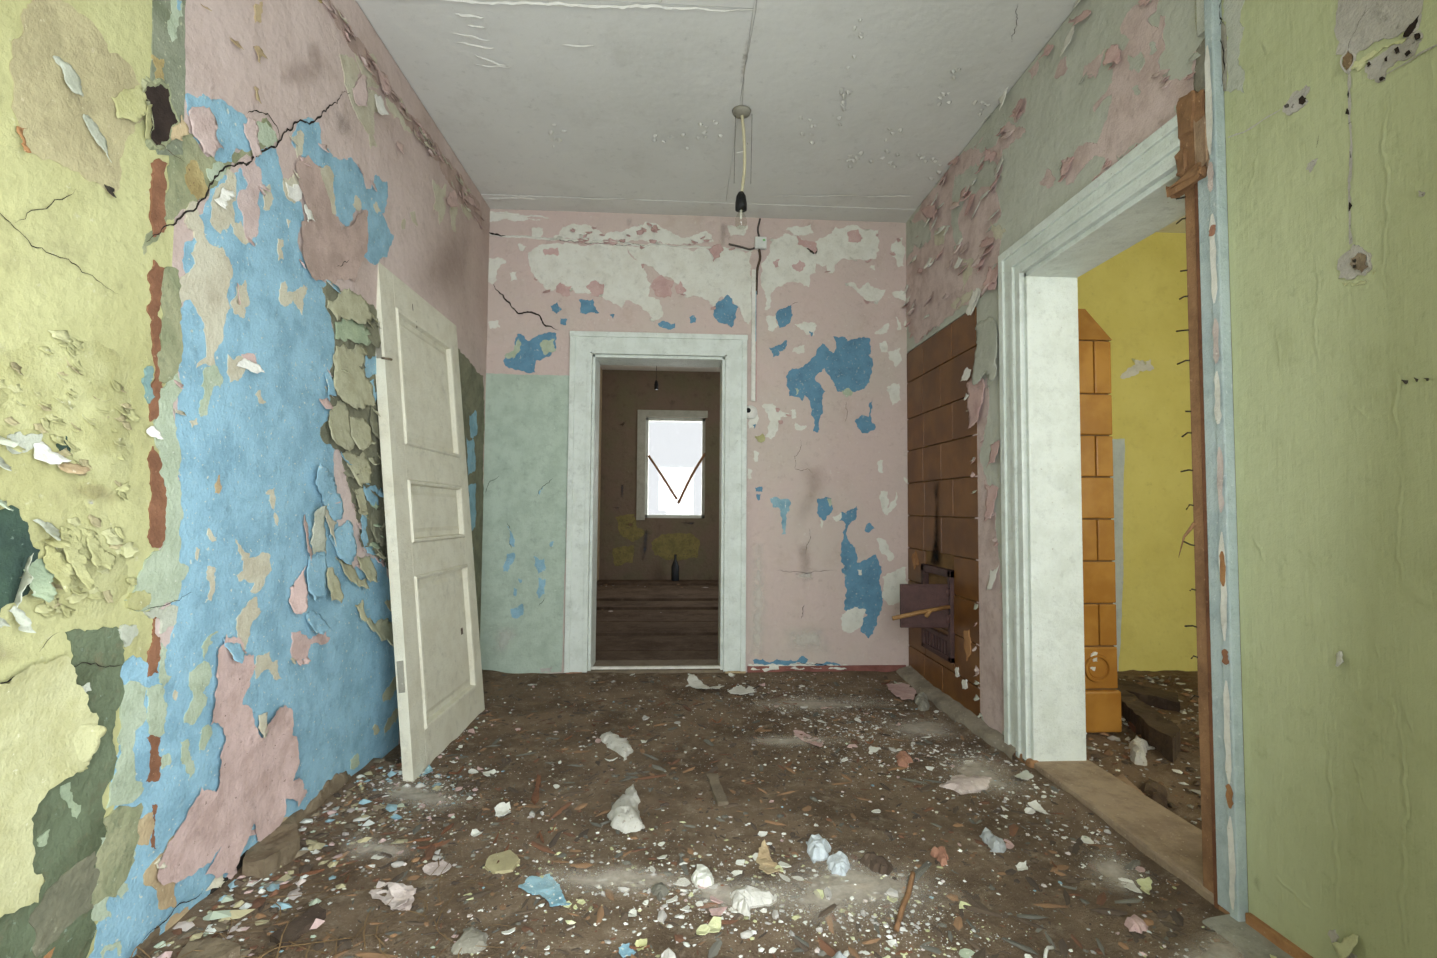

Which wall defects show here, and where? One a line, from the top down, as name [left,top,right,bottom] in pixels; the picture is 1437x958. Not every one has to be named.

flaking render [1334,0,1423,83]
peeling [1028,0,1245,192]
crack [147,91,349,242]
crack [0,192,117,294]
peeling [318,0,1027,734]
peeling [0,0,399,958]
peeling [1219,532,1236,910]
peeling [494,802,511,817]
peeling [756,839,781,874]
peeling [1028,800,1048,814]
peeling [1118,877,1152,895]
peeling [618,938,647,958]